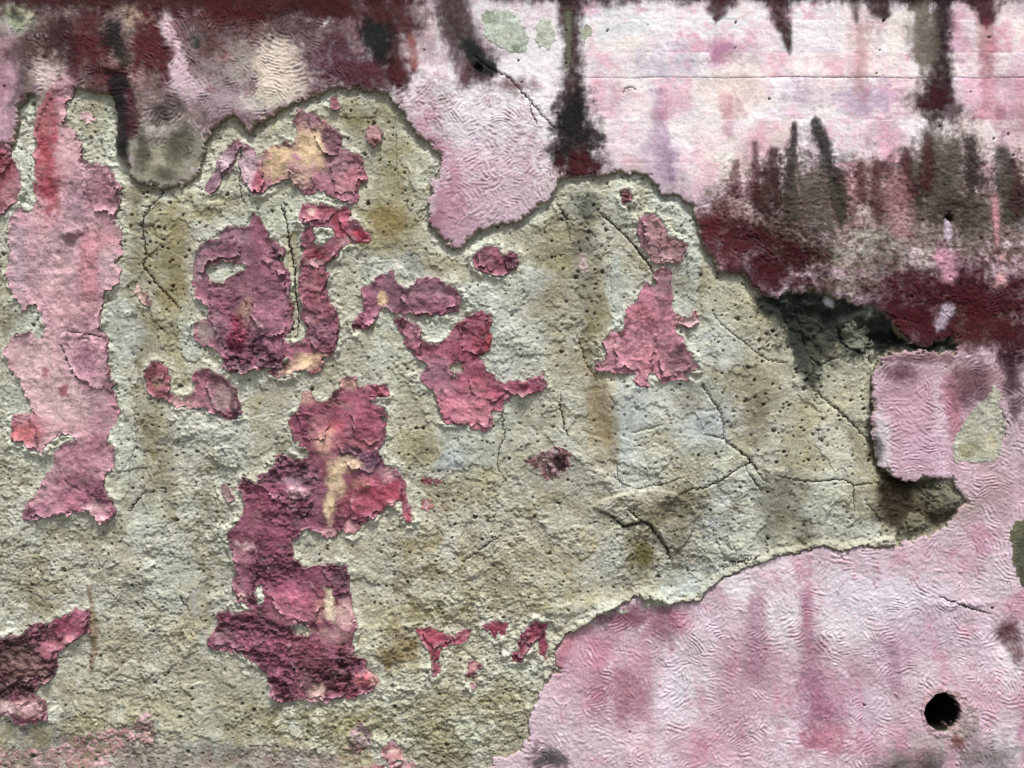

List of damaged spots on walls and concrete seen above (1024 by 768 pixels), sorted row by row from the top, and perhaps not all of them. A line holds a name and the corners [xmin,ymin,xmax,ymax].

water stain [0,0,520,160]
water stain [532,0,638,176]
water stain [681,0,737,22]
crack [142,190,177,305]
water stain [728,0,1024,413]
spalling [0,85,920,768]
crack [600,383,880,559]
spalling [869,476,965,548]